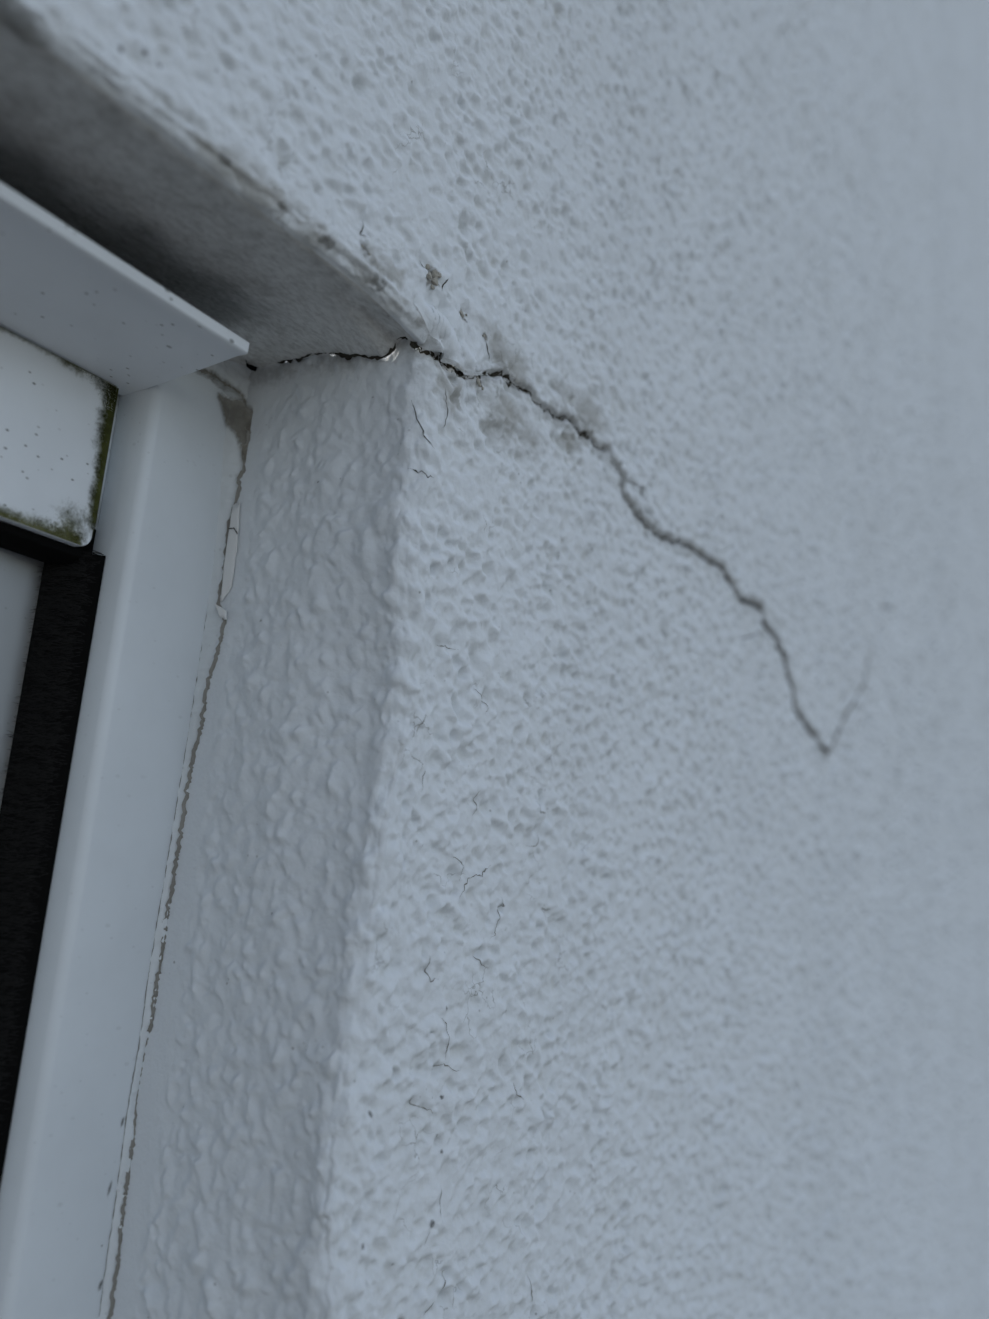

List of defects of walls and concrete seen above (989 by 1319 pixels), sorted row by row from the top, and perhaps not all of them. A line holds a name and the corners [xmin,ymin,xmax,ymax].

crack [278,337,894,755]